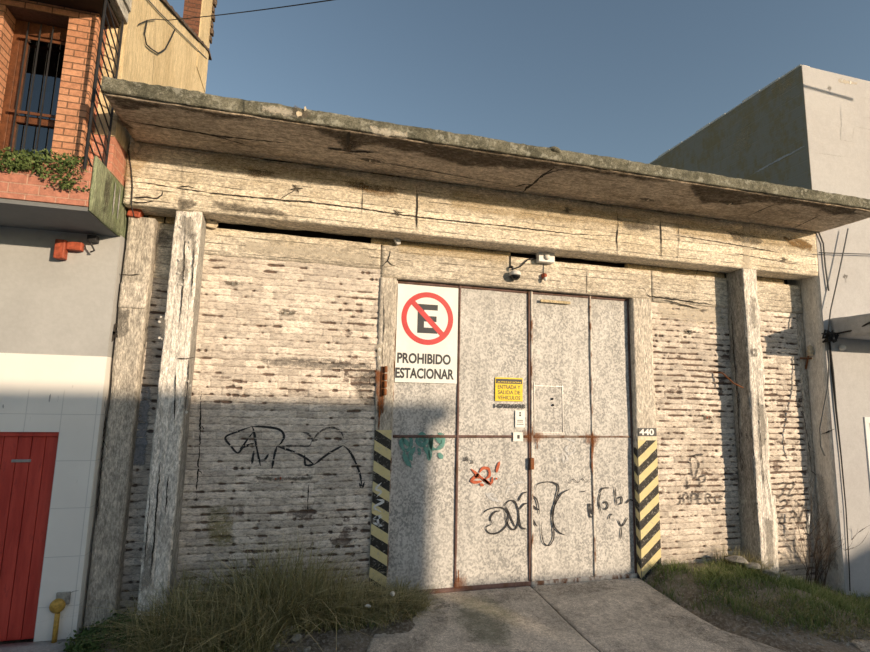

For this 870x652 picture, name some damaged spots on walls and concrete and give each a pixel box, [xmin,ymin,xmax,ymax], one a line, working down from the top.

water stain [266,107,681,182]
water stain [349,182,397,196]
crack [127,180,619,254]
crack [364,160,562,192]
water stain [692,184,867,215]
corrosion [375,371,385,428]
crack [144,465,169,578]